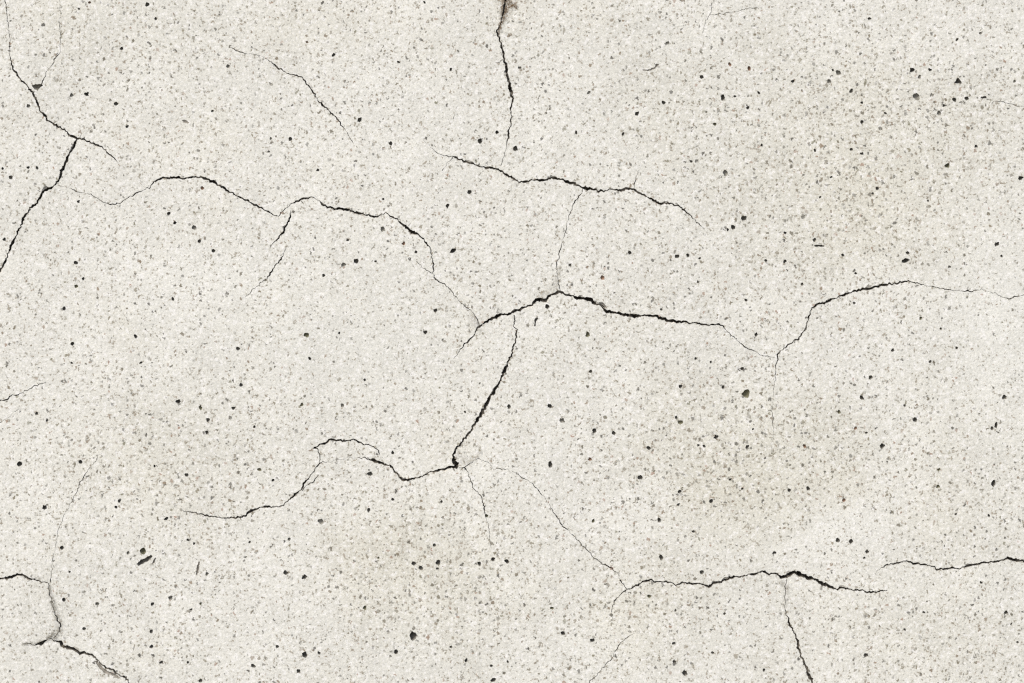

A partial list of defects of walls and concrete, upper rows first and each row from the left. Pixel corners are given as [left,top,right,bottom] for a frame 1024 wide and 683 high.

crack [0,0,763,550]
crack [768,280,1023,396]
crack [0,453,129,683]
crack [512,471,887,683]
crack [877,556,1024,571]